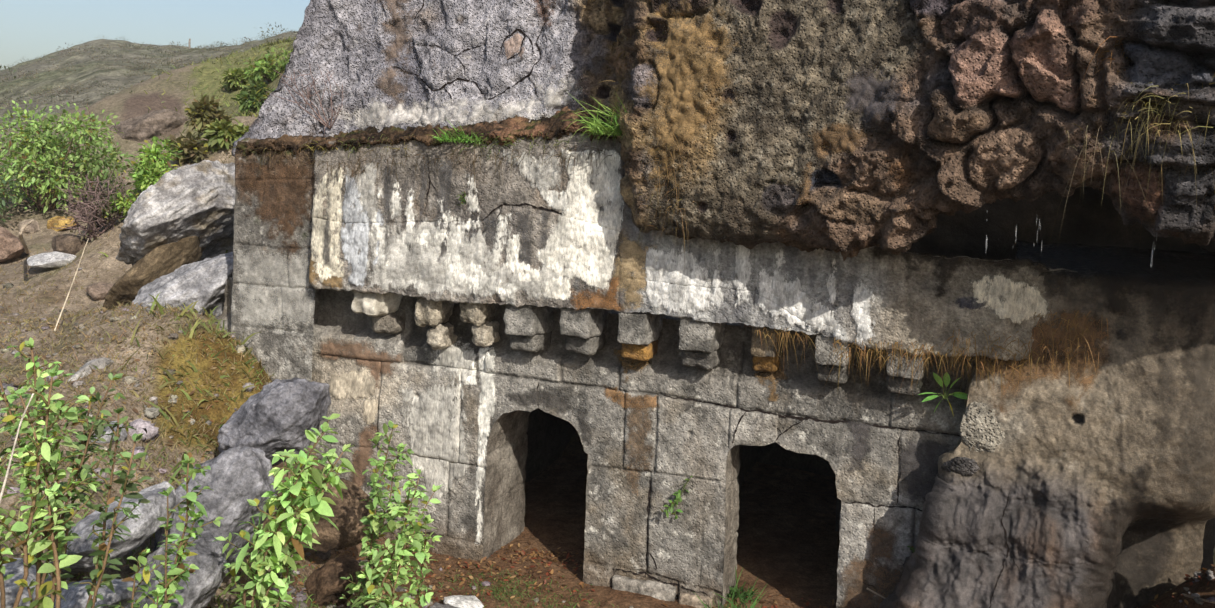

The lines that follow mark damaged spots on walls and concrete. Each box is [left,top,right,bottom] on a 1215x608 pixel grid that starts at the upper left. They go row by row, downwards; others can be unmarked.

crack [393,0,545,108]
peeling [311,149,624,300]
crack [482,203,564,233]
crack [664,395,960,526]
crack [989,492,1020,608]